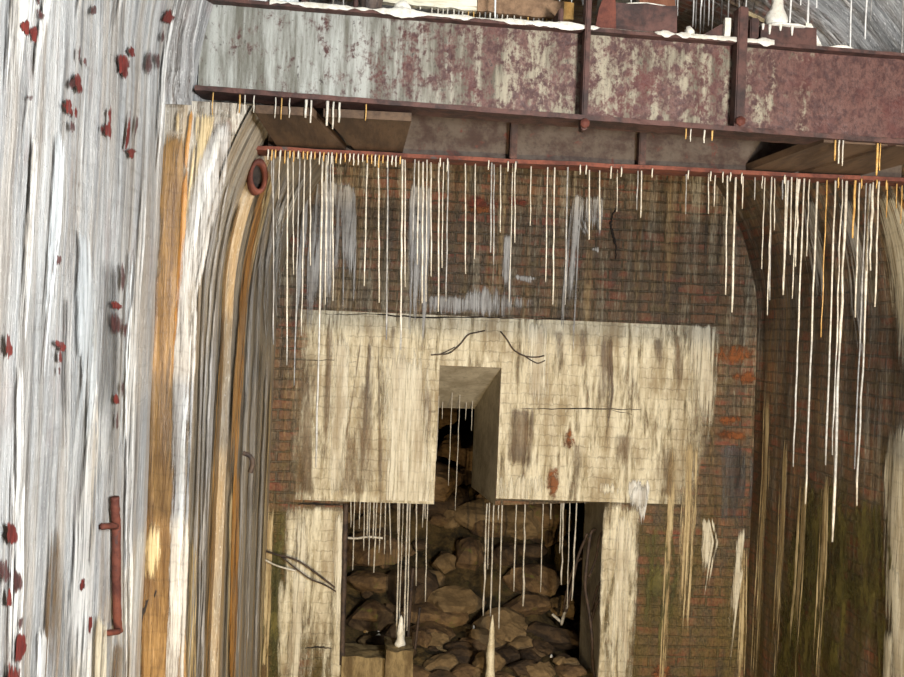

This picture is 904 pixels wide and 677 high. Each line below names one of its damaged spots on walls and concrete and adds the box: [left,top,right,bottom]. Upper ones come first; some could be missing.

spalling [21,0,45,43]
spalling [65,49,87,133]
spalling [118,47,135,80]
spalling [160,9,175,42]
leakage [839,200,868,357]
leakage [879,197,904,357]
leakage [166,123,239,677]
leakage [231,176,852,677]
spalling [0,560,22,606]
spalling [7,522,18,545]
leakage [872,425,904,677]
spalling [8,618,27,677]